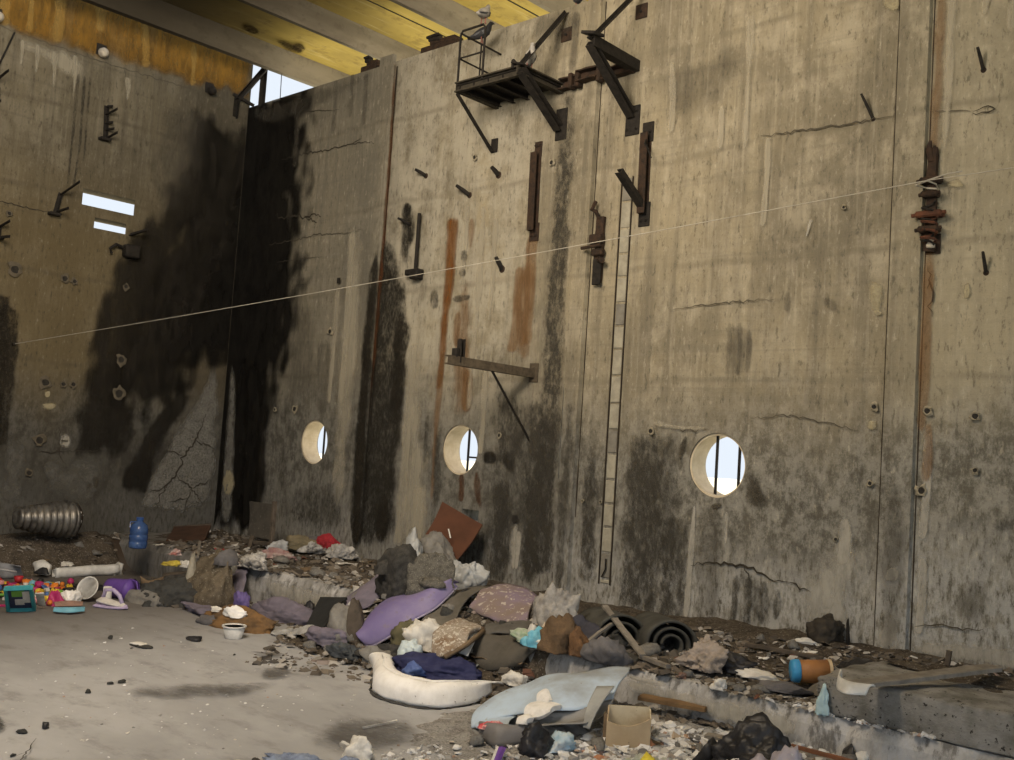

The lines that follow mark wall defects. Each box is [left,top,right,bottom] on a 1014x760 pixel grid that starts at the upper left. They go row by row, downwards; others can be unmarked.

crack [761,116,892,136]
damp [0,306,19,444]
damp [77,118,245,493]
damp [294,203,440,548]
corrosion [437,219,467,388]
damp [463,123,573,584]
crack [673,299,773,310]
crack [150,414,214,513]
damp [214,445,226,525]
damp [255,409,266,502]
damp [623,437,696,617]
crack [691,561,811,592]